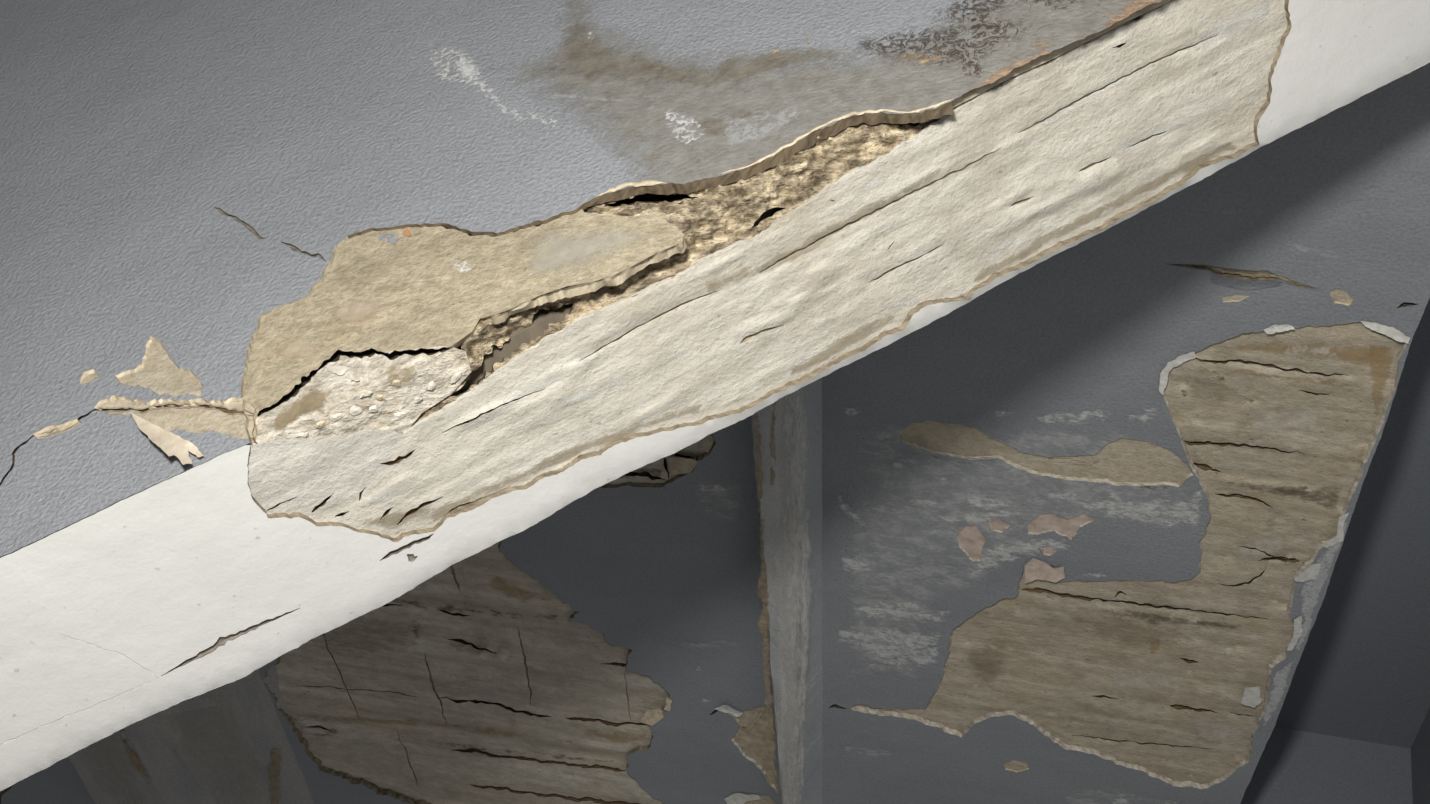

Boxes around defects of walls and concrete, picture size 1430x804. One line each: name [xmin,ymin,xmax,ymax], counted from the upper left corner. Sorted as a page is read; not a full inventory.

leakage [428,41,558,127]
leakage [529,0,1161,184]
crack [214,207,326,262]
spalling [79,0,1292,562]
crack [1170,264,1323,292]
crack [0,402,254,485]
leakage [838,410,1203,677]
spalling [850,289,1410,789]
spalling [264,541,672,804]
peeling [715,705,779,804]